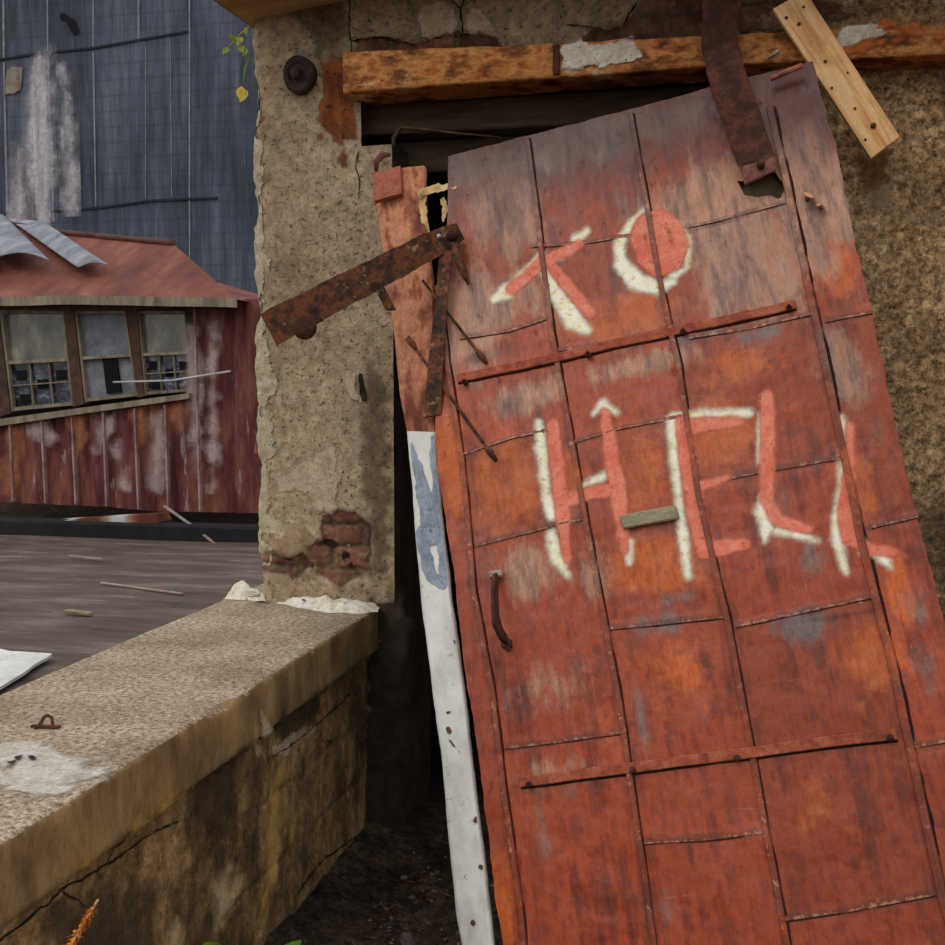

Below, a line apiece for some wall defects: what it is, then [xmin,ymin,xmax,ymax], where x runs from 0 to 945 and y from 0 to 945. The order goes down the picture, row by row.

crack [348,0,472,52]
spalling [560,0,702,69]
leakage [9,55,81,223]
rust [860,151,887,190]
peeling [253,79,371,585]
crack [0,818,187,942]
leakage [194,749,249,822]
leakage [261,765,295,913]